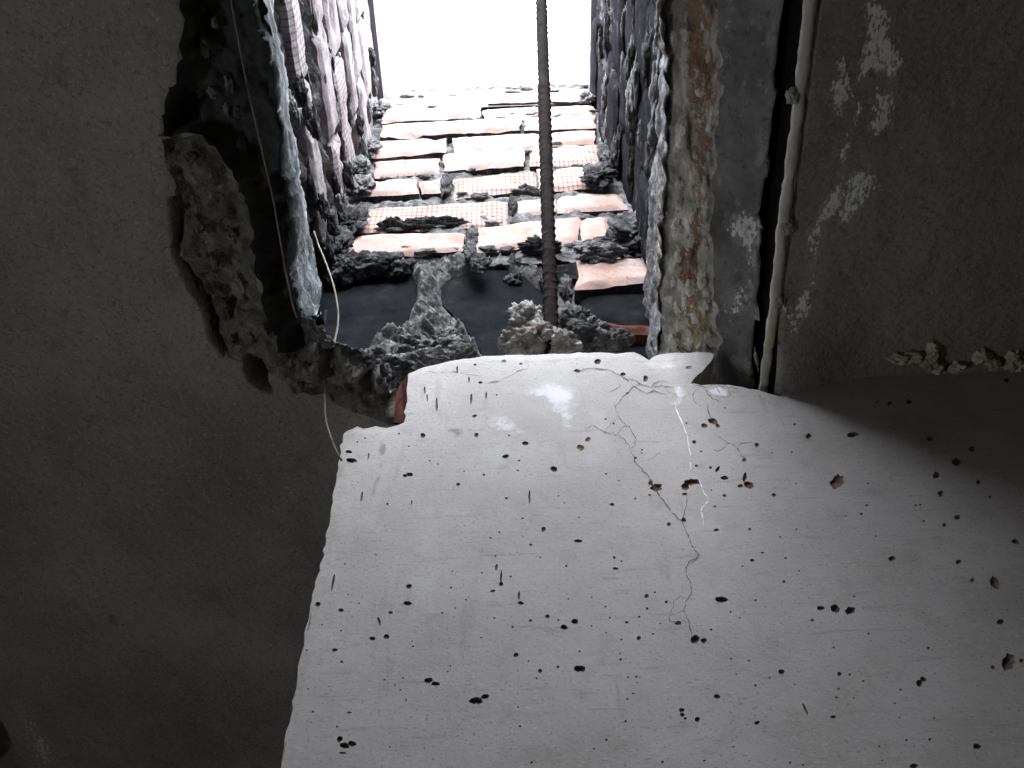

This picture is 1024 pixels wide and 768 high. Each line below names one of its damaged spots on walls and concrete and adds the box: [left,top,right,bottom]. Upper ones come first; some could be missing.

spalling [158,0,544,426]
flaking render [557,0,724,361]
rust [678,0,722,334]
water stain [781,275,816,333]
water stain [807,0,903,259]
crack [576,368,749,634]